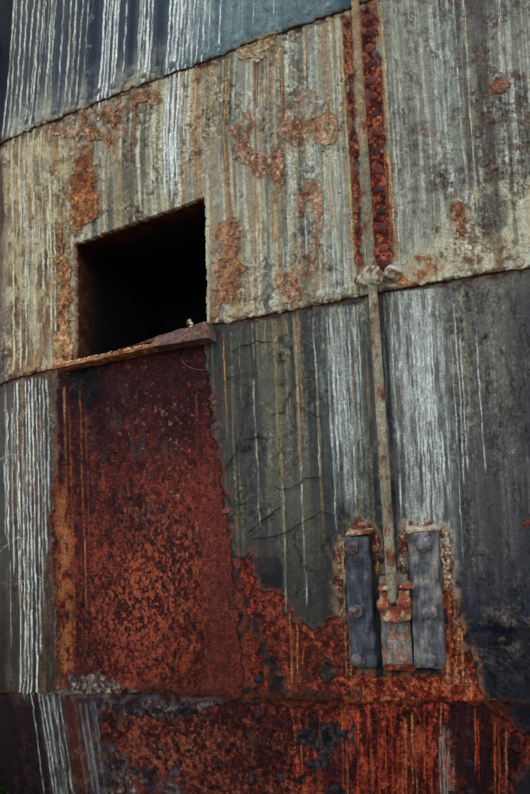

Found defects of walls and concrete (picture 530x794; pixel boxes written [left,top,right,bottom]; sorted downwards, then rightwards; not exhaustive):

peeling [42,87,162,237]
leakage [97,0,127,107]
leakage [138,0,154,82]
leakage [163,0,221,199]
leakage [323,160,350,293]
rust [341,4,439,285]
peeling [449,201,482,271]
leakage [4,379,72,794]
peeling [46,215,530,794]
rust [335,512,482,703]